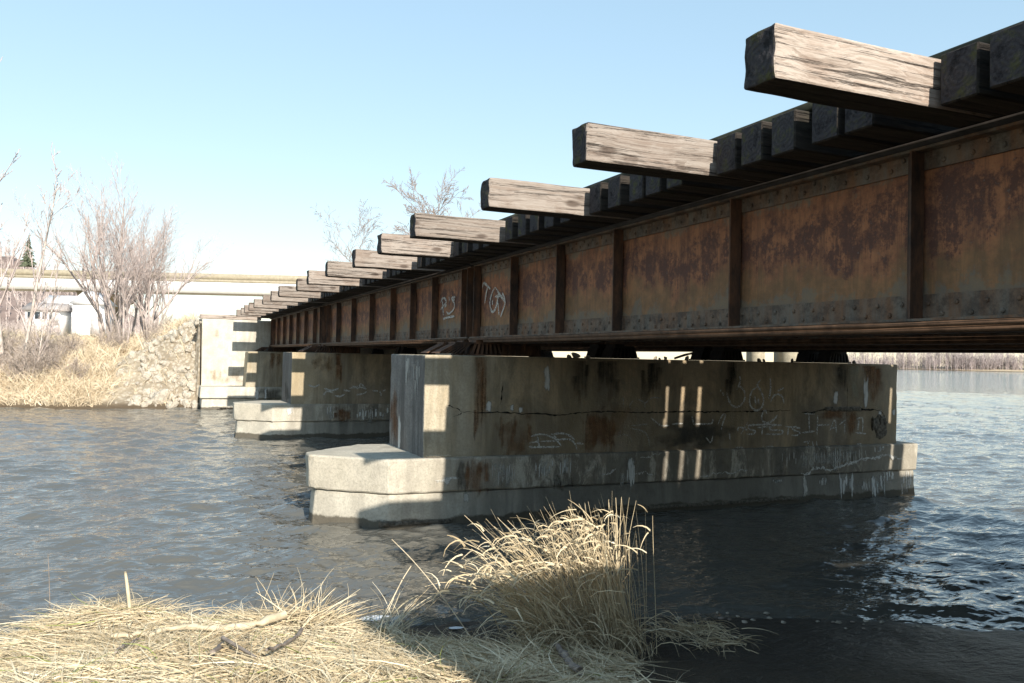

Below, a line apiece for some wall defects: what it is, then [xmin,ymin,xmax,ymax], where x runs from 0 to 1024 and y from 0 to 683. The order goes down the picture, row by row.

crack [449,386,825,416]
efflorescence [782,446,911,499]